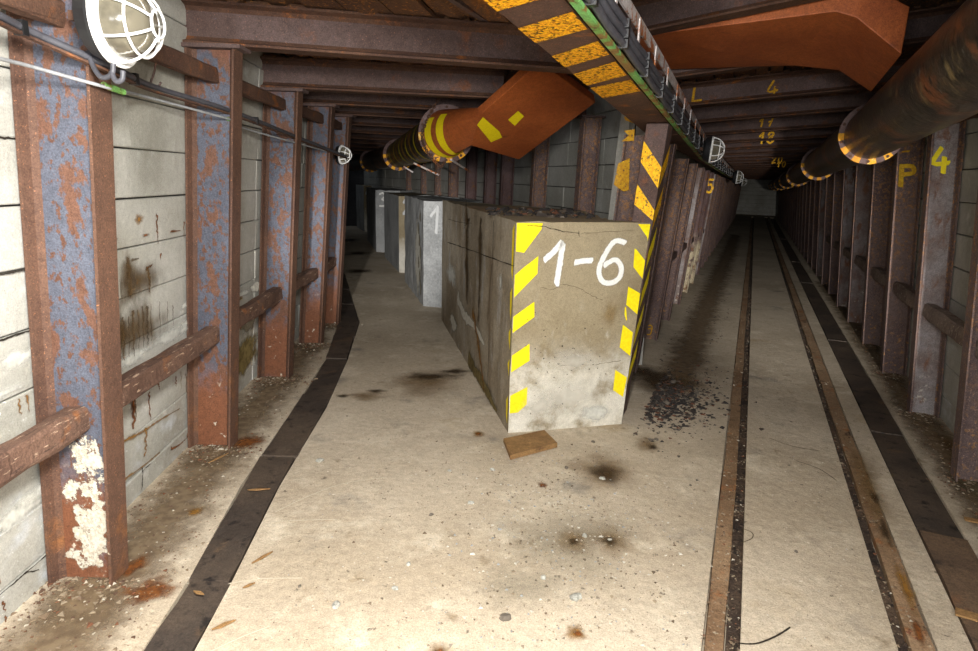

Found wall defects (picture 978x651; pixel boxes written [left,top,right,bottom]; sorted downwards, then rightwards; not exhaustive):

damp [121,258,154,301]
damp [120,301,187,368]
rust [124,384,188,480]
peeling [62,435,108,569]